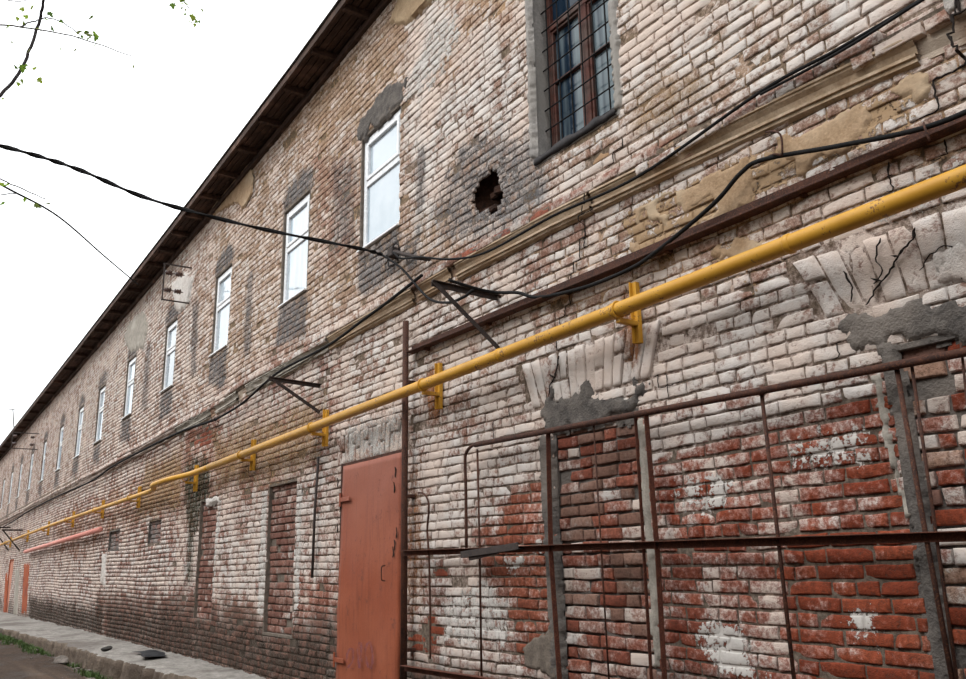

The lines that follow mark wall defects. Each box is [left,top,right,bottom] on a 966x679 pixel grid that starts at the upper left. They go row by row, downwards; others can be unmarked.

crack [919,0,966,119]
spalling [473,169,504,215]
crack [843,227,953,305]
peeling [408,482,557,653]
peeling [658,396,935,679]
damp [29,597,334,679]